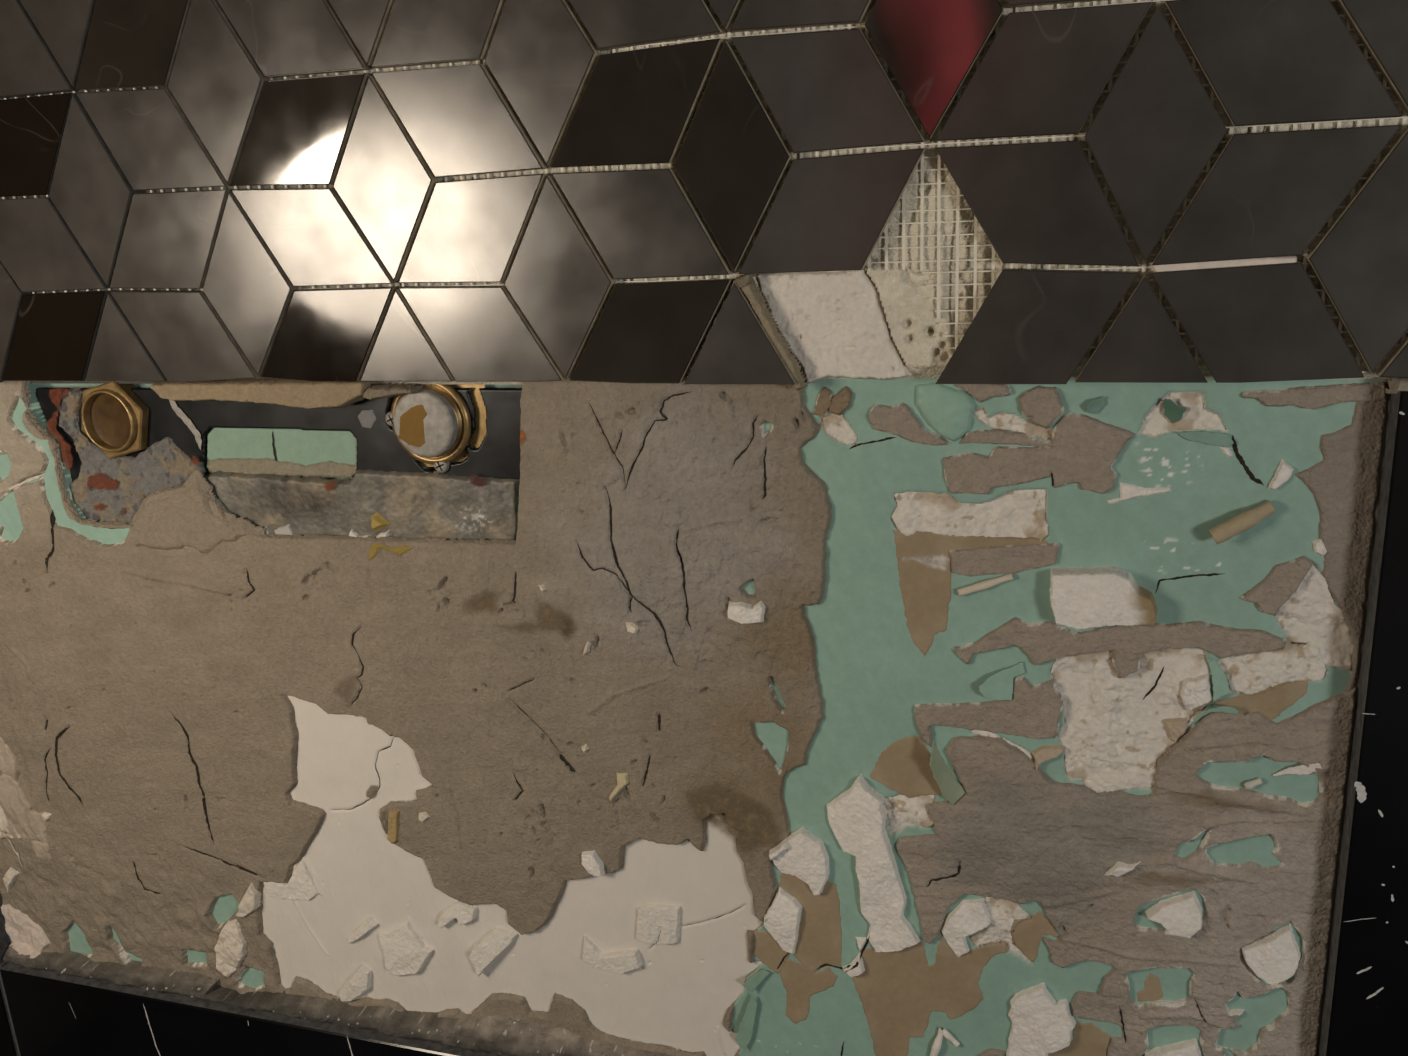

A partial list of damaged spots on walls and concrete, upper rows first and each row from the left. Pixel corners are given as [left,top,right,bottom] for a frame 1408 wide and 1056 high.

spalling [757,269,912,383]
spalling [973,408,1052,439]
spalling [1140,392,1226,436]
crack [576,391,692,666]
spalling [891,490,1049,656]
spalling [1050,539,1352,793]
spalling [0,737,52,863]
crack [44,720,83,806]
crack [173,715,262,877]
spalling [262,696,1060,1056]
damp [691,789,777,849]
peeling [1048,1022,1111,1056]